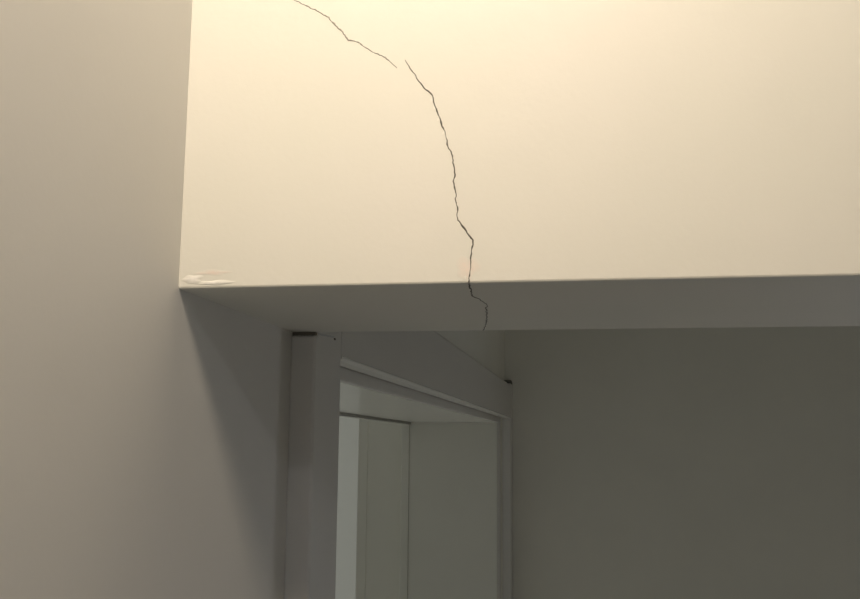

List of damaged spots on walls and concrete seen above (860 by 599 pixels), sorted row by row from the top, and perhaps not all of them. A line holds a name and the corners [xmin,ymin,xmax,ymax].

crack [294,0,488,330]